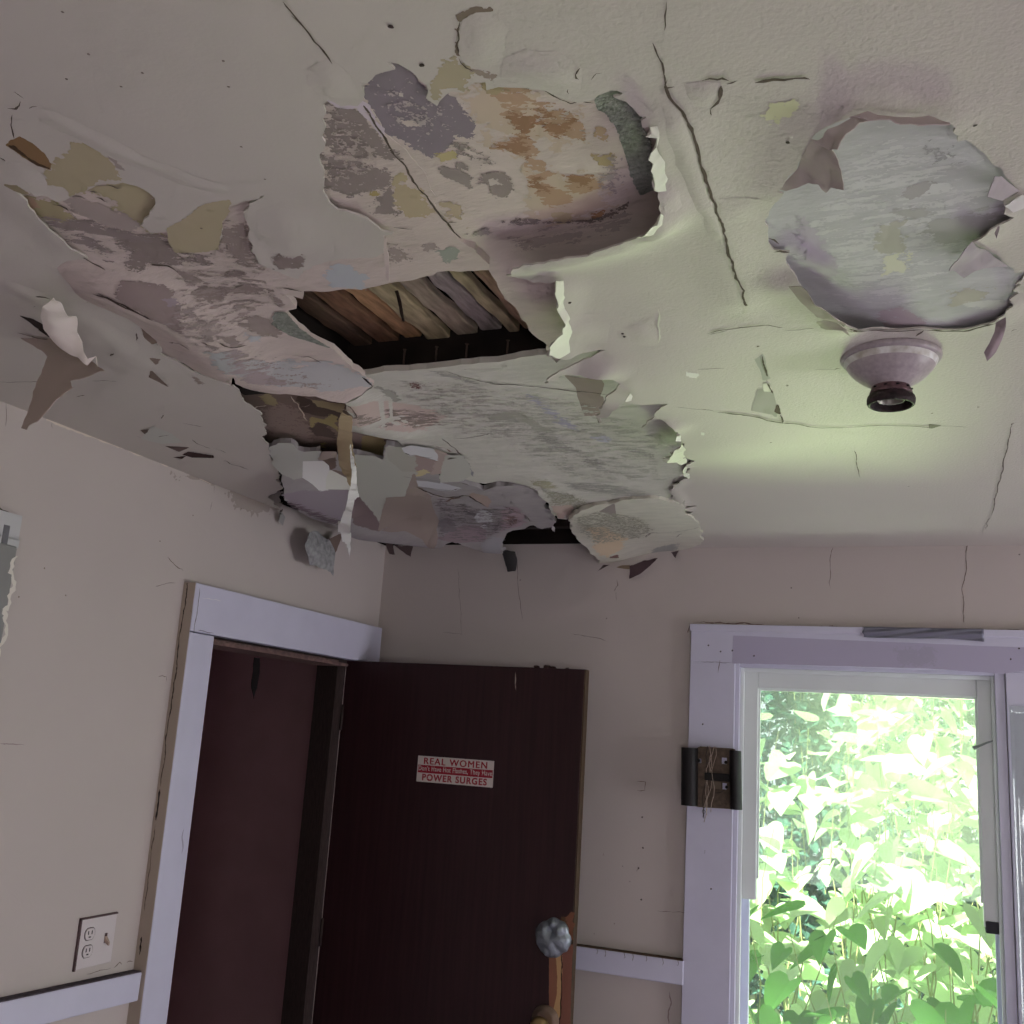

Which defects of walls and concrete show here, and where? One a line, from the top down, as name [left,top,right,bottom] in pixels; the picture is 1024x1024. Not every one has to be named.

crack [283,2,332,63]
flaking render [22,63,705,575]
crack [653,2,813,335]
flaking render [765,117,1024,329]
crack [986,423,1014,526]
crack [960,546,968,622]